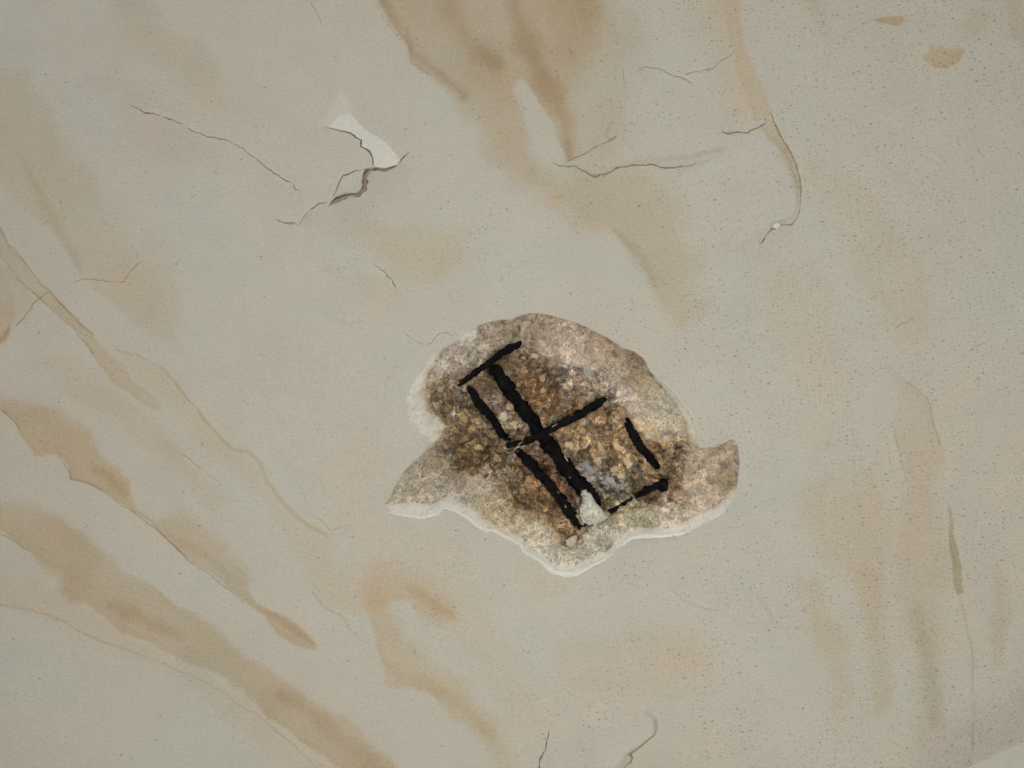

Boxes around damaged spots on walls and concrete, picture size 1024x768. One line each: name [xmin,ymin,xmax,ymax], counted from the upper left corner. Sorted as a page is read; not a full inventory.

crack [623,52,733,85]
crack [131,105,374,225]
flaking render [243,113,400,225]
crack [554,136,696,178]
crack [722,114,802,245]
leakage [0,56,733,768]
corrosion [447,437,537,511]
corrosion [470,355,574,422]
corrosion [530,446,579,506]
spalling [383,313,740,577]
corrosion [632,475,680,507]
leakage [373,0,1024,768]